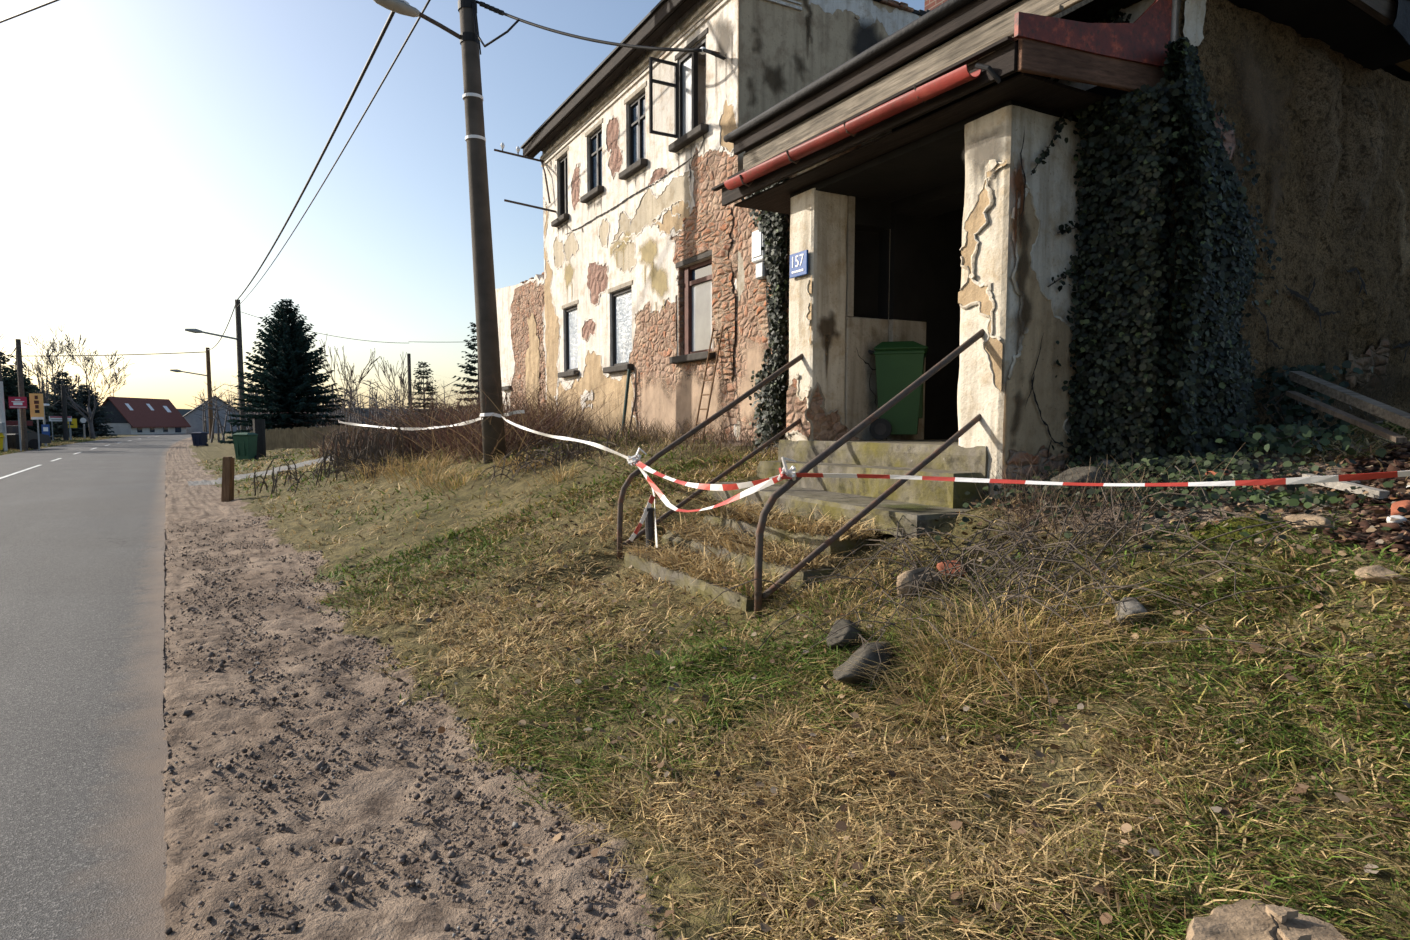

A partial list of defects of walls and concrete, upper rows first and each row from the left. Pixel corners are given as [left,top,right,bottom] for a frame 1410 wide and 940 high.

damp [750,69,783,103]
flaking render [509,96,860,444]
flaking render [958,159,1081,492]
crack [1025,333,1068,455]